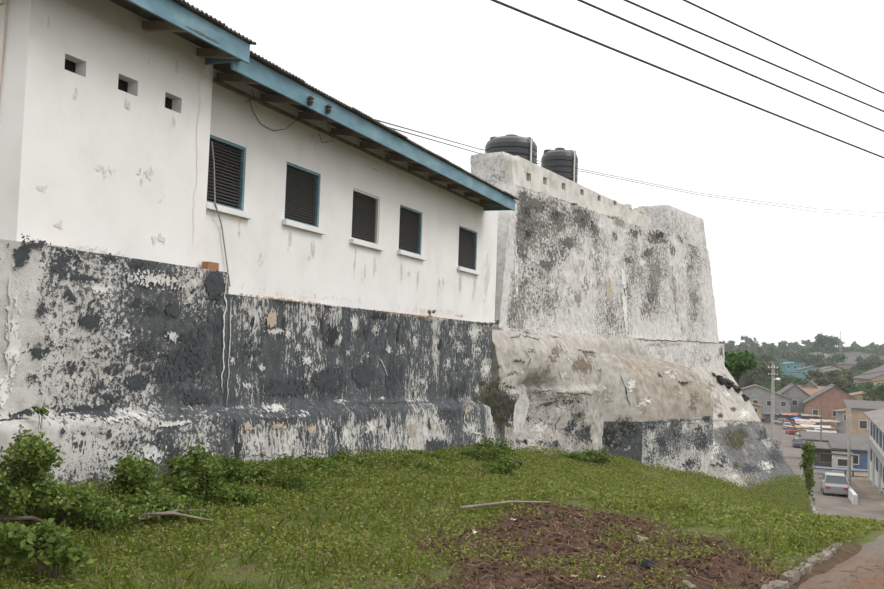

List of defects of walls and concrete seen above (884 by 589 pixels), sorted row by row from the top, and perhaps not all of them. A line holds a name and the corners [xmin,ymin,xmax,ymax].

peeling [0,279,27,409]
leakage [240,283,388,347]
leakage [514,191,697,322]
peeling [231,381,377,460]